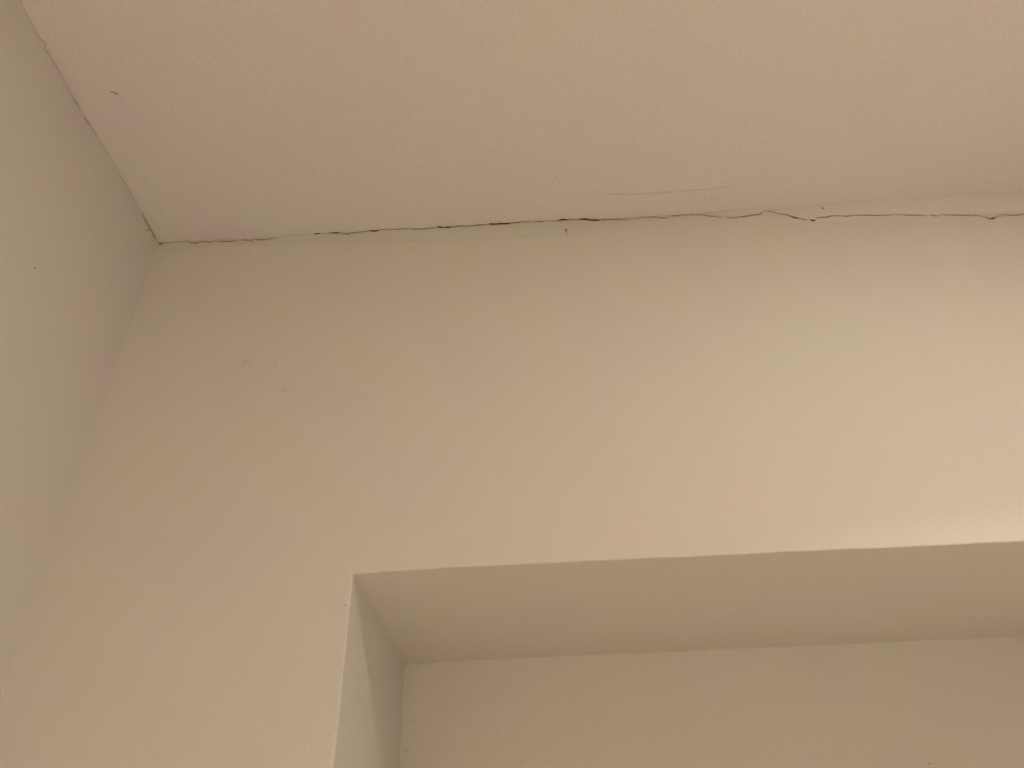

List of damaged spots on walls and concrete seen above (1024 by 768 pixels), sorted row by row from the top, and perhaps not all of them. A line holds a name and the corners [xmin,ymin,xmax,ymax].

crack [314,214,716,235]